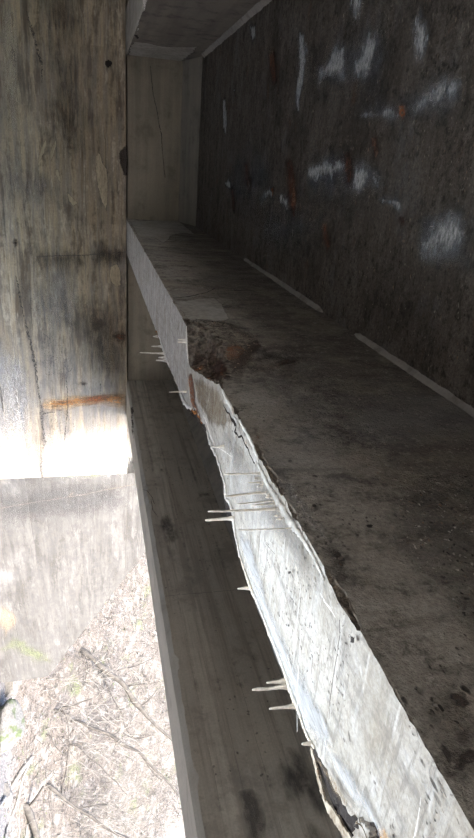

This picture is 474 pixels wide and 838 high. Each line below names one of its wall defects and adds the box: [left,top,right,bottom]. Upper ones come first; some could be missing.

spalling [169,290,261,389]
crack [15,277,68,480]
corrosion [46,395,123,408]
corrosion [189,374,201,420]
crack [223,405,256,466]
water stain [241,792,263,838]
spalling [310,746,380,838]